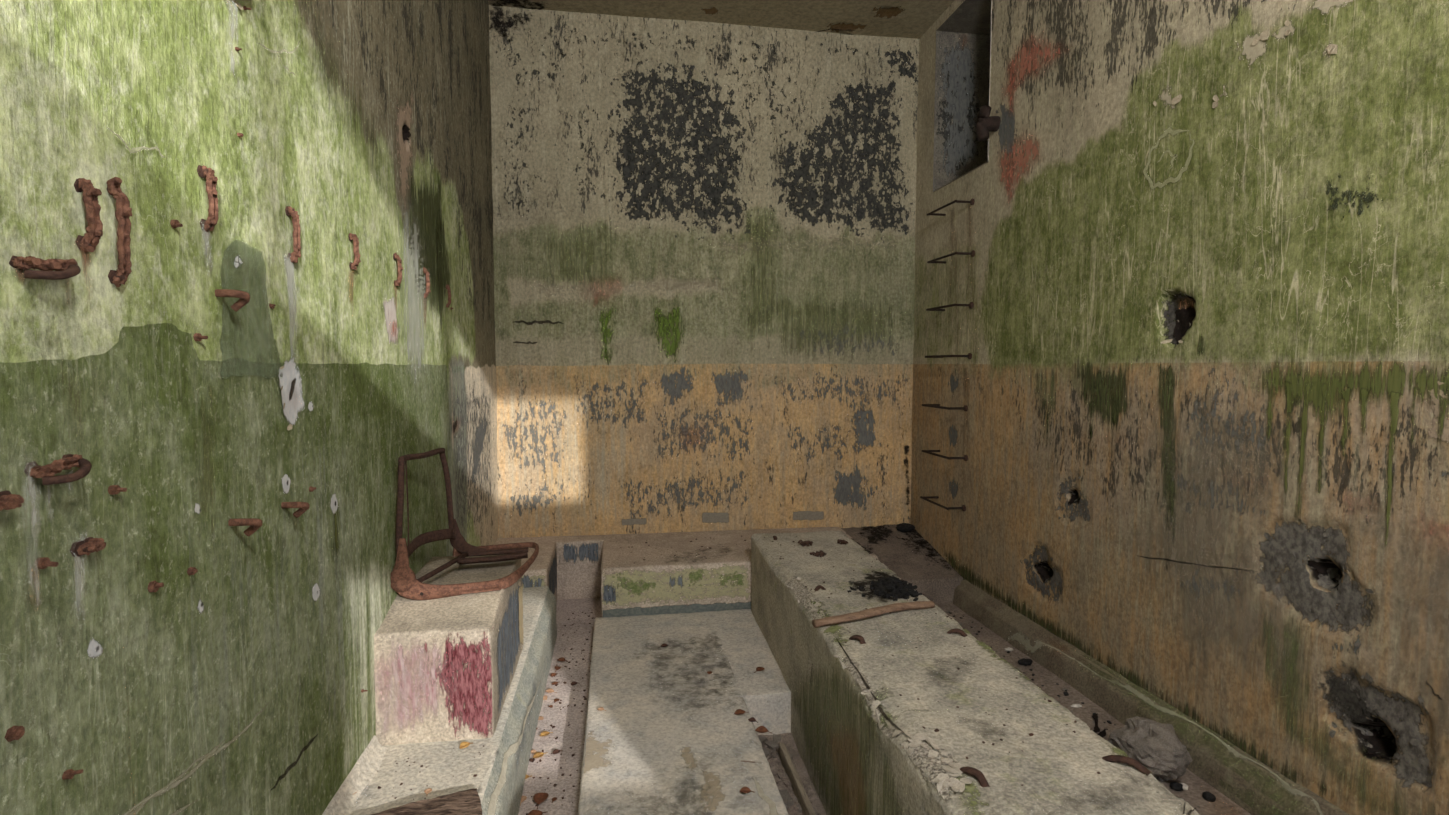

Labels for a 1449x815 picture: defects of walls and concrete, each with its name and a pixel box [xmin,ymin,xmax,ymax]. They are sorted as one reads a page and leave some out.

water stain [936,43,987,176]
water stain [489,0,918,365]
hole [1161,294,1196,346]
flaking render [1055,476,1090,524]
water stain [1197,335,1244,448]
water stain [1262,359,1449,546]
flaking render [1020,545,1062,602]
flaking render [1171,474,1433,793]